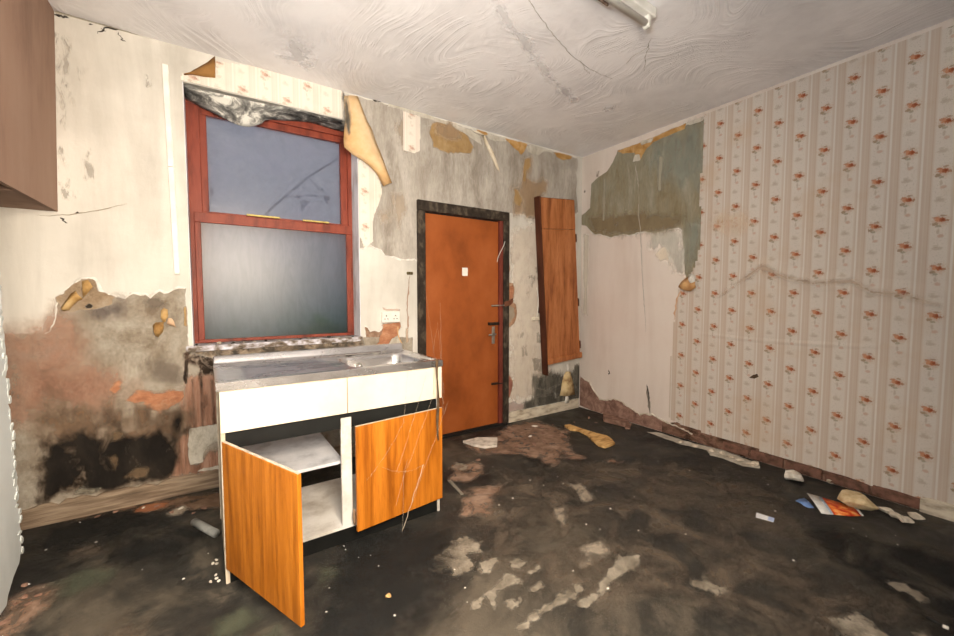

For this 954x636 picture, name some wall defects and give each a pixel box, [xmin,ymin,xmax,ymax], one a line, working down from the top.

peeling [184,56,215,78]
flaking render [343,95,704,327]
damp [4,277,413,510]
flaking render [580,376,926,523]